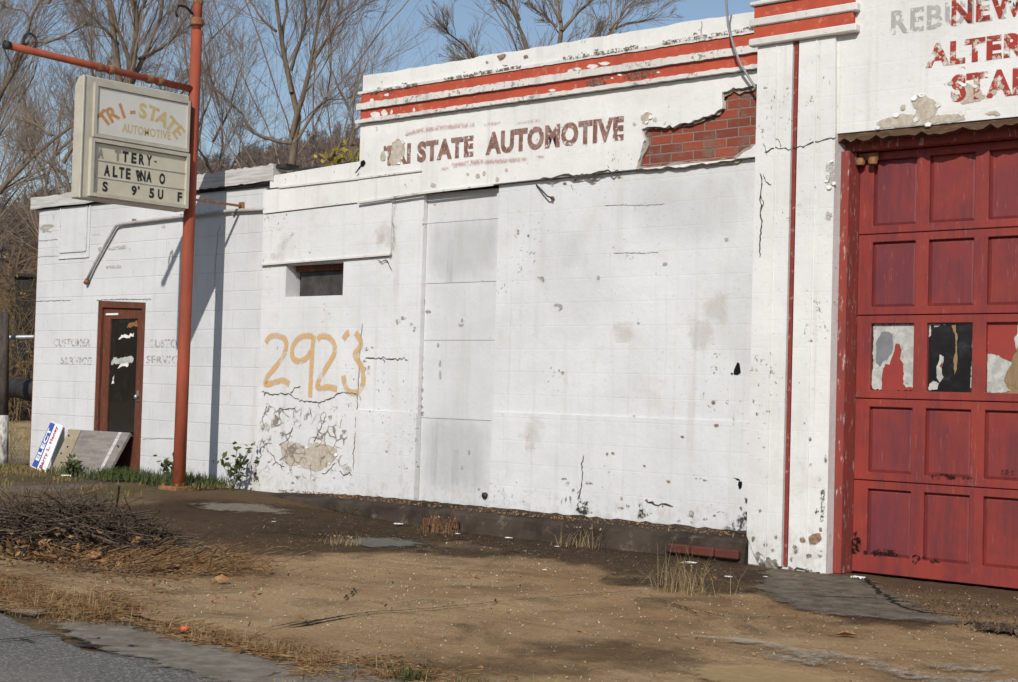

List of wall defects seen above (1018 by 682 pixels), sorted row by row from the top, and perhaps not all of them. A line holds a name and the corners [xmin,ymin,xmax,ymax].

flaking render [615,90,757,173]
peeling [875,81,997,130]
crack [759,137,836,255]
peeling [872,324,914,391]
peeling [928,323,958,390]
peeling [987,323,1018,393]
peeling [256,406,352,484]